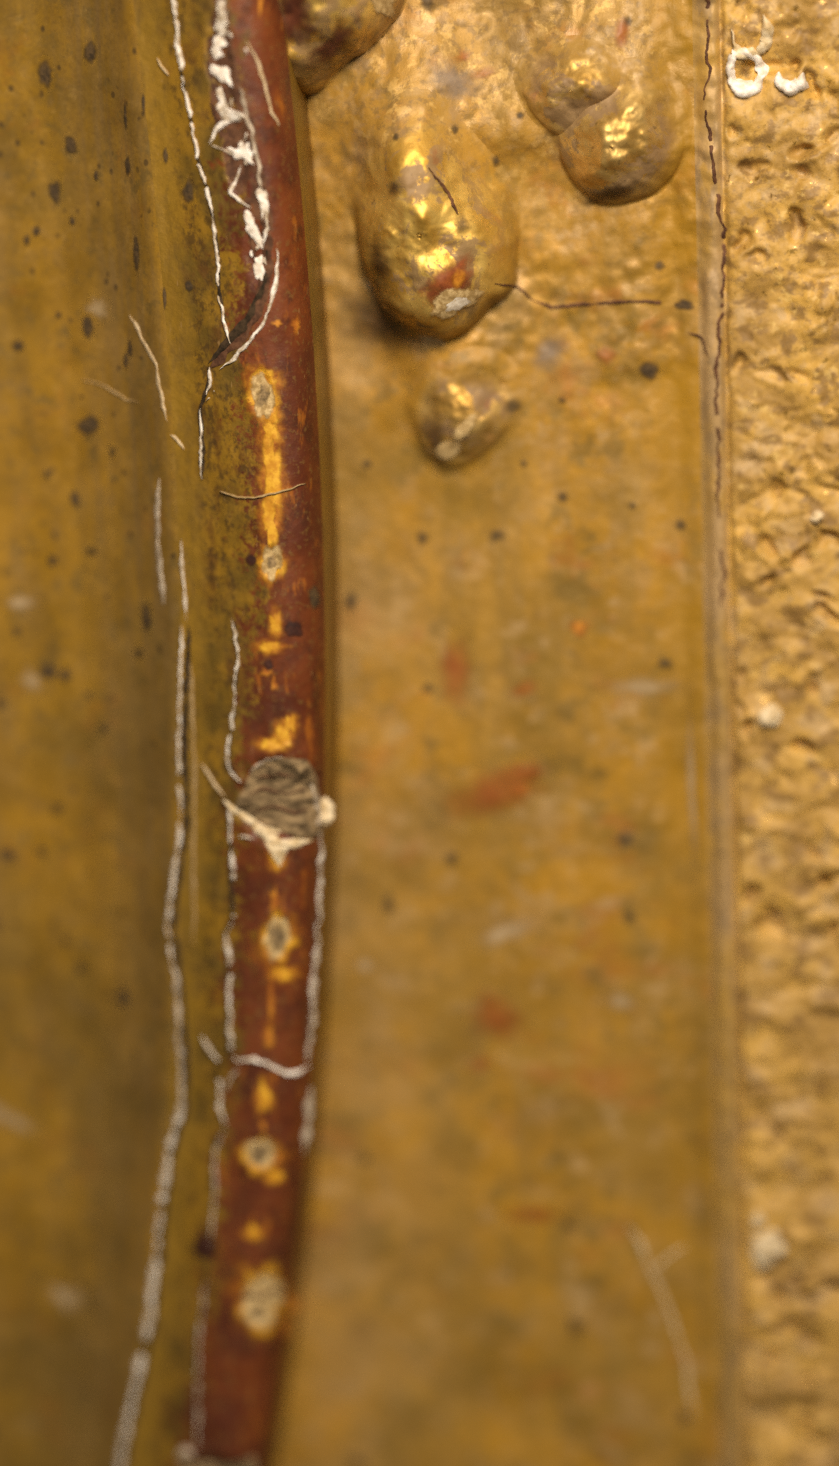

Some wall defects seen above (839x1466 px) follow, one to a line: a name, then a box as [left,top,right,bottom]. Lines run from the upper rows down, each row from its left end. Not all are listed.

crack [171,0,279,479]
crack [494,0,727,607]
crack [116,479,324,1466]